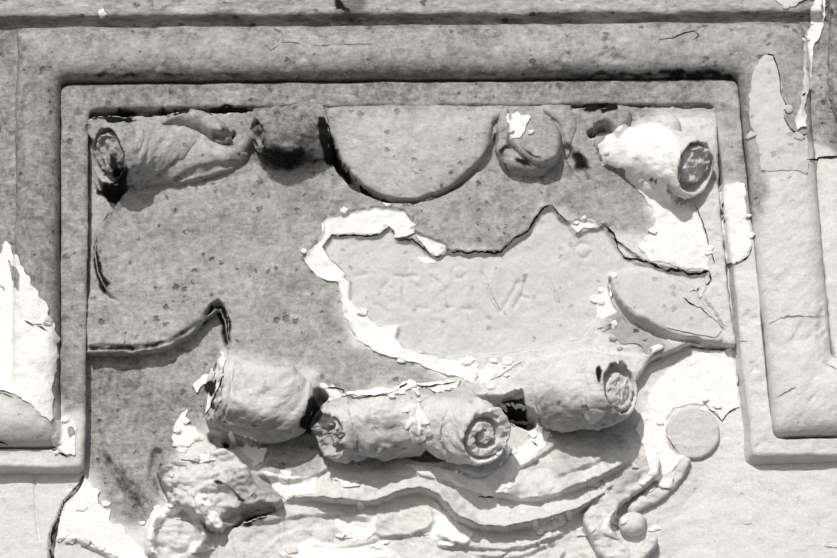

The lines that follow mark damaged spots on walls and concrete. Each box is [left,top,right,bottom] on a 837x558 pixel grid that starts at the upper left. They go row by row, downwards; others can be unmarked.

peeling [745,0,827,174]
peeling [0,241,77,455]
crack [448,205,567,255]
spalling [301,122,755,498]
crack [49,474,84,558]